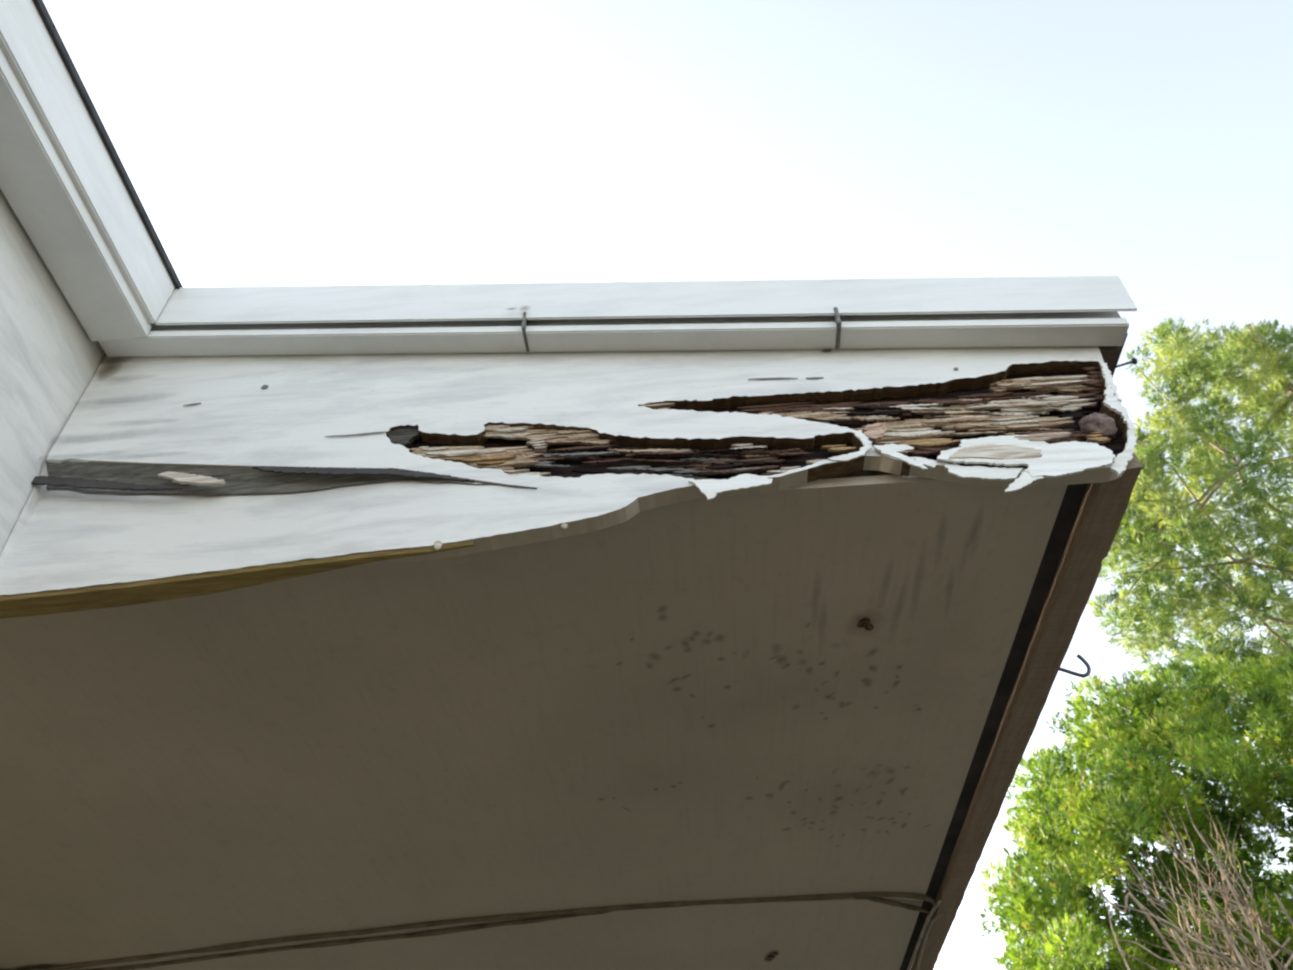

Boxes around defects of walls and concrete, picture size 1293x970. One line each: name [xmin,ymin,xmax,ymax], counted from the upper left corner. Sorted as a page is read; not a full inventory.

spalling [387,363,1137,501]